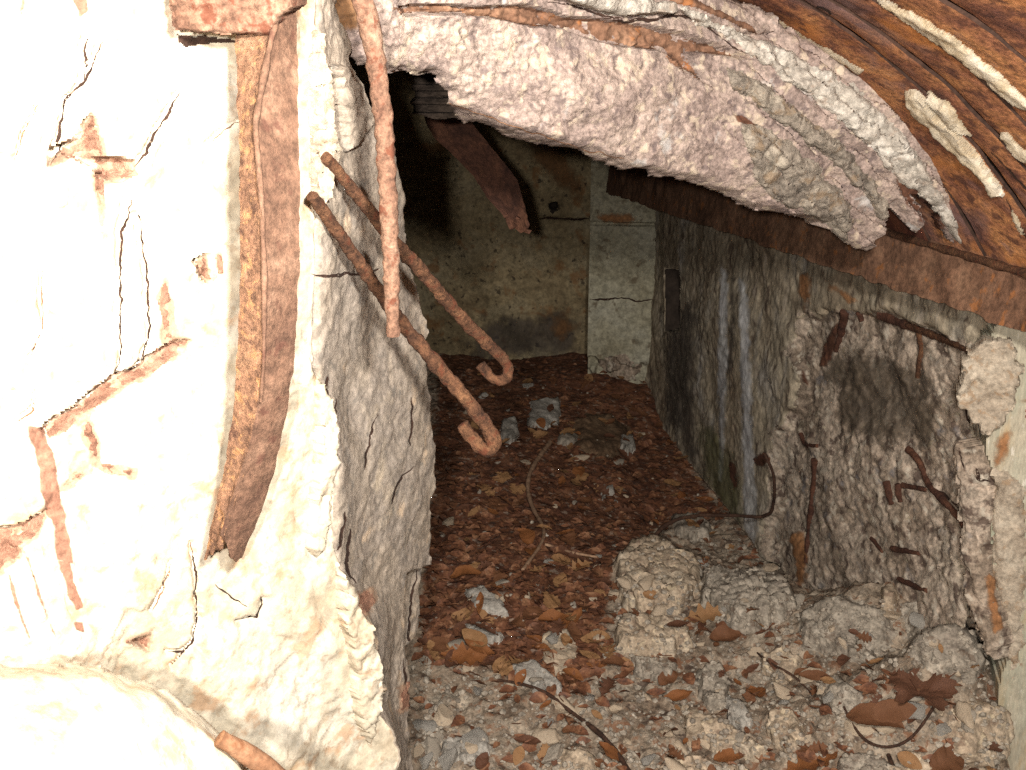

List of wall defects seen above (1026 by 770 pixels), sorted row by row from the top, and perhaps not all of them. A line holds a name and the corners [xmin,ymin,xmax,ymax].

rust [177,34,235,47]
rust [335,0,358,28]
rust [670,0,757,35]
crack [12,38,103,165]
crack [135,94,179,166]
rust [897,180,945,230]
crack [29,270,44,360]
crack [113,199,151,381]
rust [819,324,839,366]
water stain [826,356,938,439]
spalling [759,309,1026,628]
peeling [989,468,1026,678]